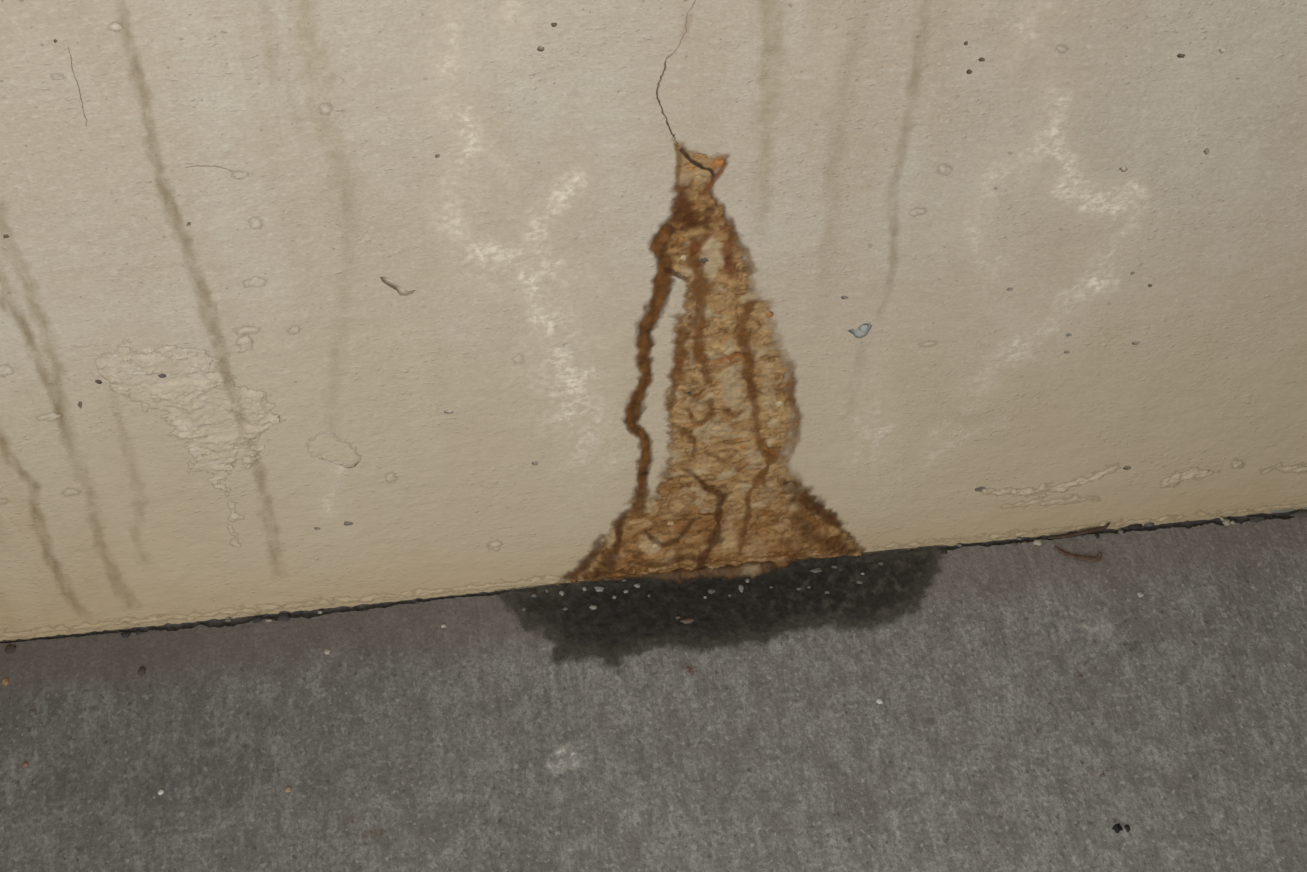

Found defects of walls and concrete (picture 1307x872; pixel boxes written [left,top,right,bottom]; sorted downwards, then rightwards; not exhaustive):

crack [656,0,696,139]
rust [556,144,865,586]
leakage [500,545,940,666]